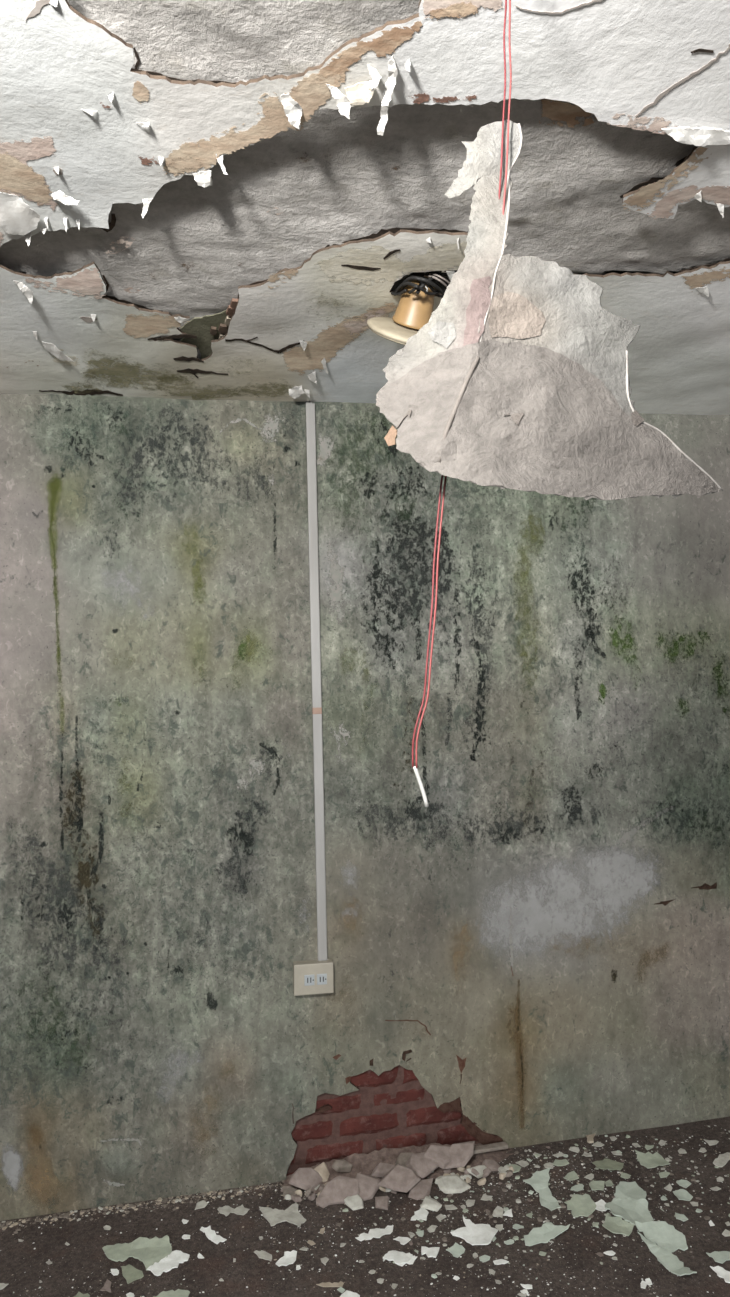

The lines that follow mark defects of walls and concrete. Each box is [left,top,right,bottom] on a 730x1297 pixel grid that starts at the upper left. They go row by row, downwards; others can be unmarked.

flaking render [0,0,730,359]
peeling [25,331,80,366]
peeling [259,302,397,442]